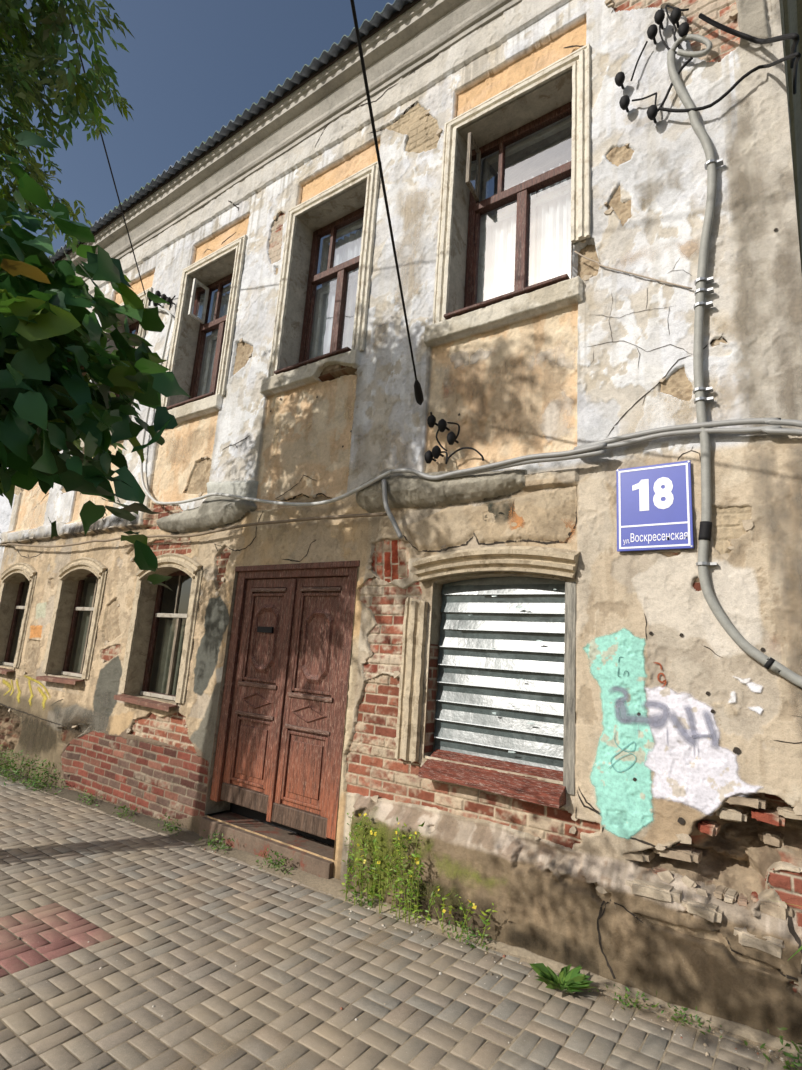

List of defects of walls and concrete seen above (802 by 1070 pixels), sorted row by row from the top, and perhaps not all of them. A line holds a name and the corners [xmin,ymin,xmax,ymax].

spalling [605,0,740,62]
spalling [377,103,443,153]
spalling [606,143,634,166]
spalling [604,185,632,226]
spalling [345,539,600,849]
spalling [0,706,22,751]
spalling [60,712,209,821]
spalling [594,882,611,903]
spalling [620,793,802,970]
crack [597,899,643,979]
spalling [789,977,802,996]